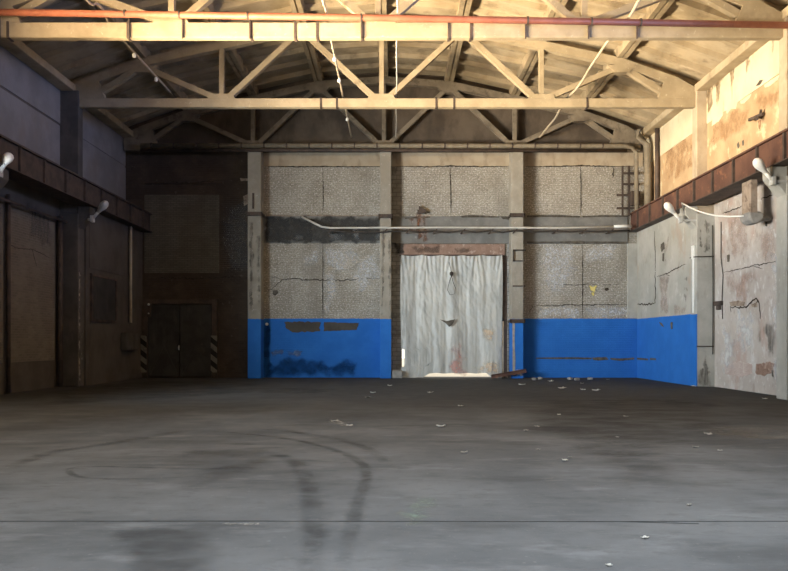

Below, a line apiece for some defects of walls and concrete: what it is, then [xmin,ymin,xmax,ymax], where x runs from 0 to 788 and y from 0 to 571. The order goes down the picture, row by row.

crack [268,251,379,310]
crack [529,231,685,318]
crack [730,298,761,315]
peeling [284,321,359,333]
flaking render [724,361,776,377]